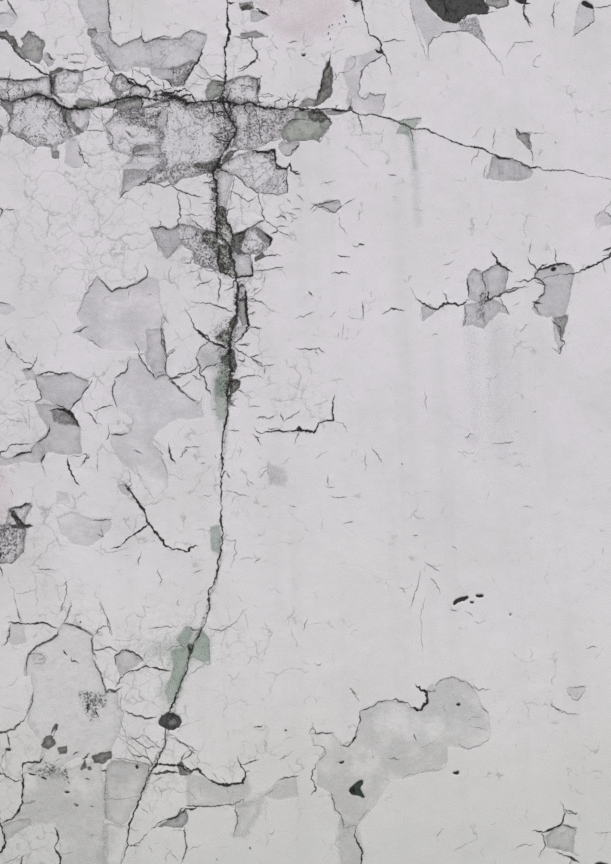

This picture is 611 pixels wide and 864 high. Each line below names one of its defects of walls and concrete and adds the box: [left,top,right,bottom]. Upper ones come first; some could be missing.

spalling [410,0,530,70]
crack [506,0,542,67]
spalling [0,0,351,345]
crack [404,123,609,182]
crack [297,252,611,336]
peeling [528,247,574,354]
peeling [0,352,98,484]
crack [0,0,405,864]
spalling [0,503,32,576]
crack [400,562,440,649]
peeling [4,606,200,864]
peeling [311,676,491,864]